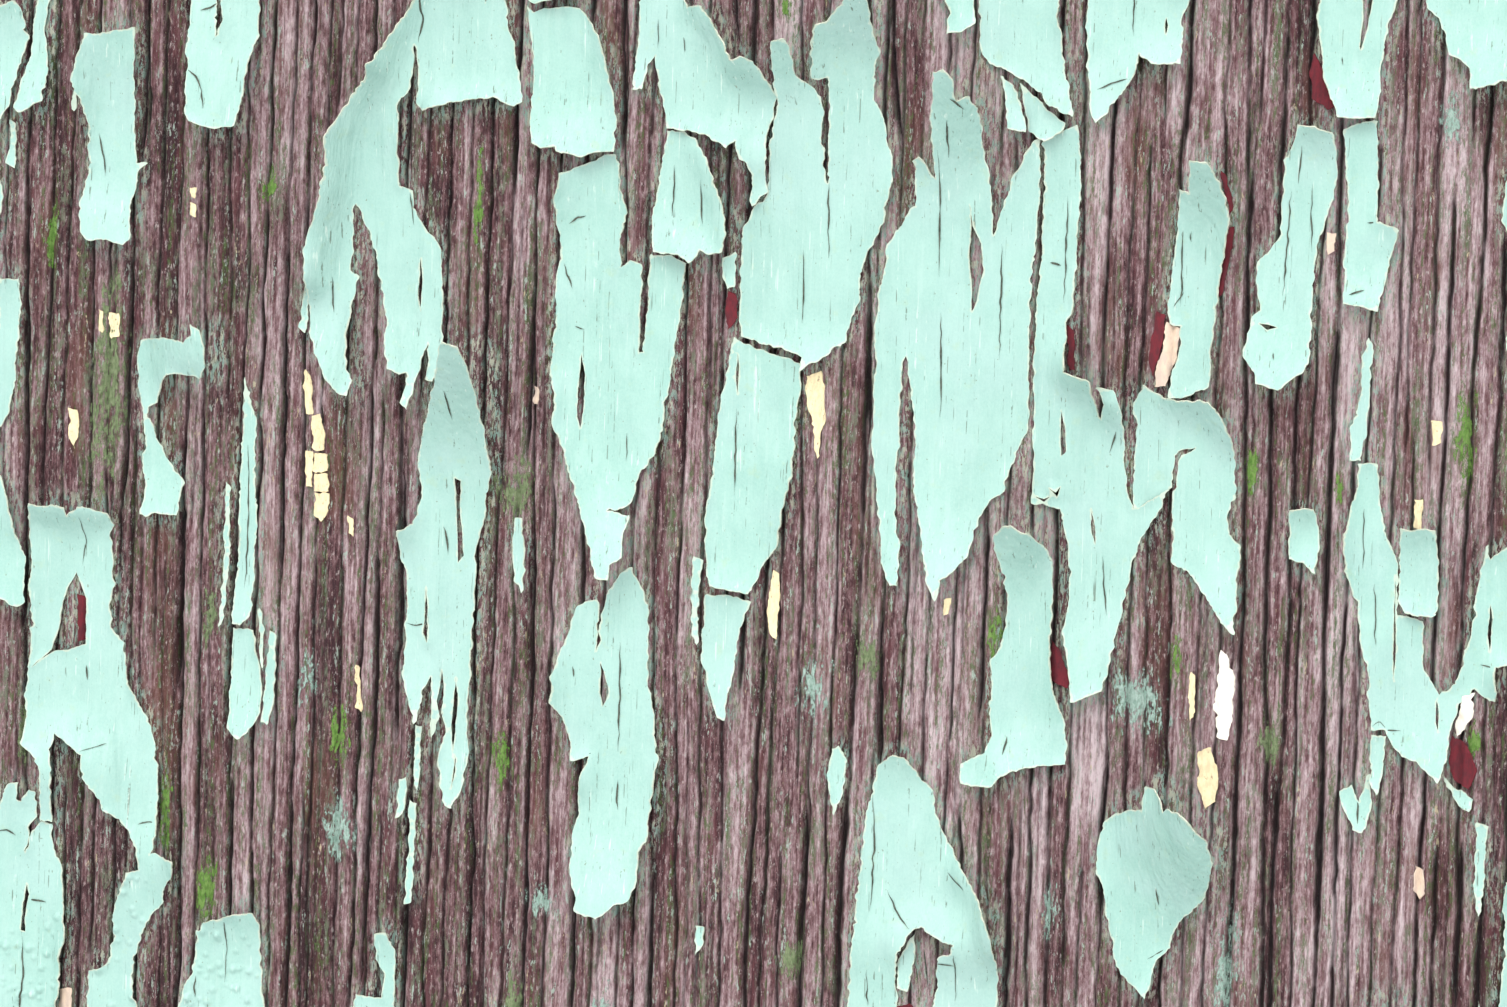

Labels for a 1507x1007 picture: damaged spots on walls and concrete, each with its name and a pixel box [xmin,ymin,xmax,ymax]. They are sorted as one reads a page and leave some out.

peeling [0,0,51,168]
peeling [70,27,148,245]
peeling [184,0,261,129]
peeling [1243,0,1399,391]
peeling [1426,0,1507,89]
peeling [0,475,173,1007]
peeling [137,324,206,517]
peeling [218,378,277,740]
peeling [298,0,1241,920]
peeling [1339,338,1507,917]
peeling [847,755,999,1007]
peeling [1096,786,1213,999]